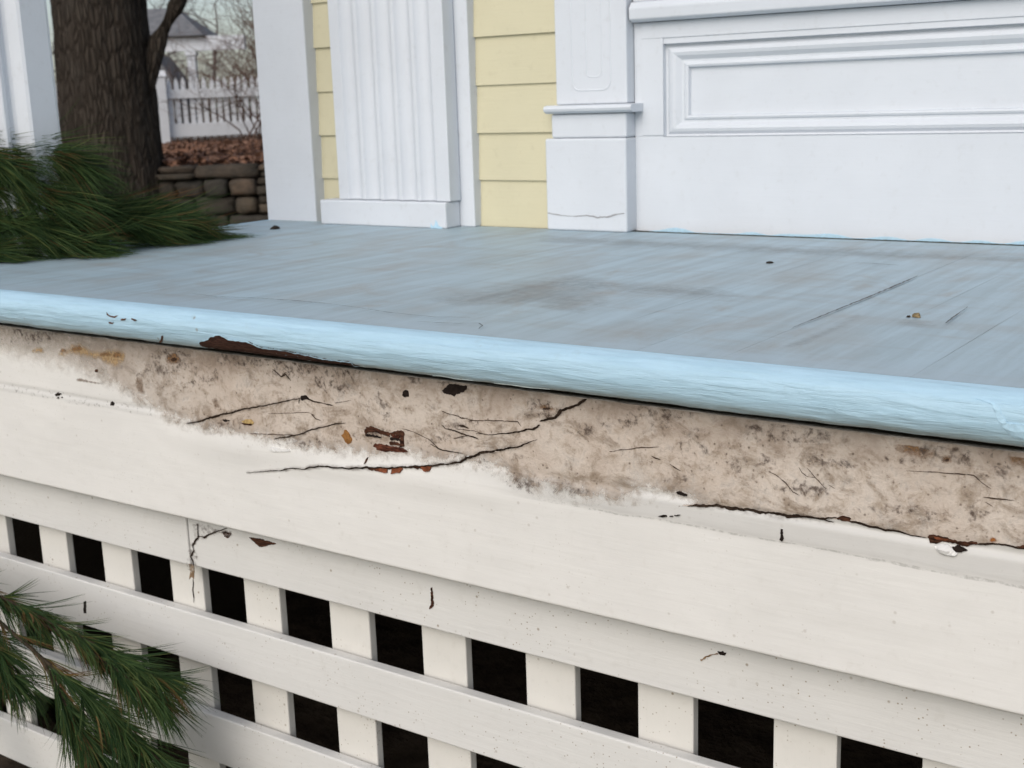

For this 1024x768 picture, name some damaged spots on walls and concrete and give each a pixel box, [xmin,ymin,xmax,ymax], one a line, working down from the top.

peeling [391,466,432,474]
crack [249,399,587,473]
water stain [87,337,1024,547]
crack [688,468,926,538]
peeling [975,398,1024,440]
crack [189,524,227,602]
peeling [249,537,276,547]
crack [978,542,1022,550]